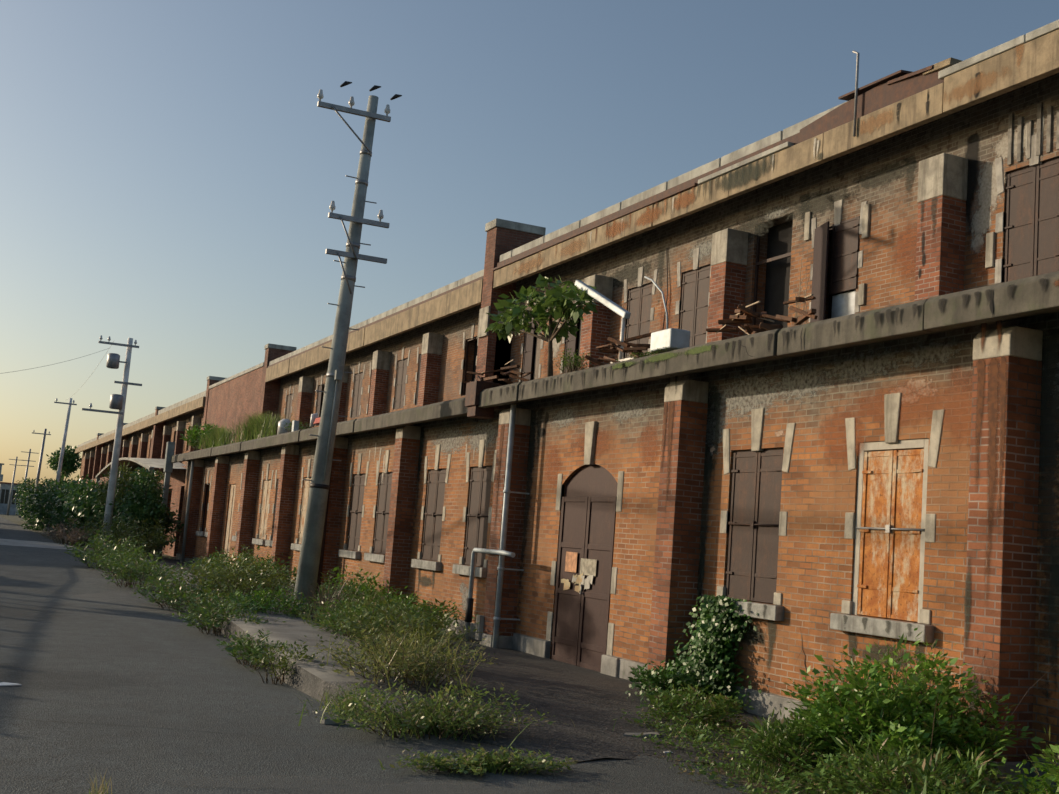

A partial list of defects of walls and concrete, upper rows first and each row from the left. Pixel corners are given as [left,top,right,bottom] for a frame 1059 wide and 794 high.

water stain [1037,327,1059,697]